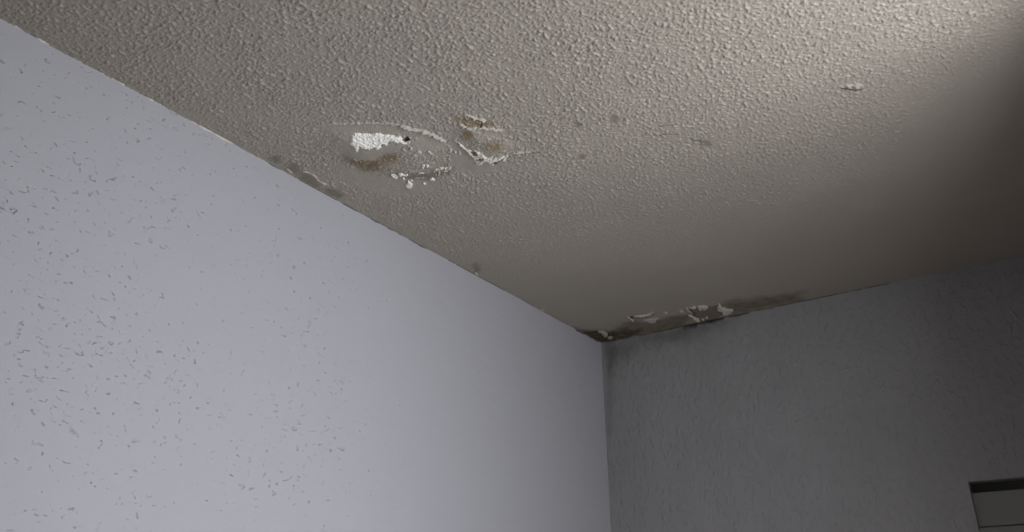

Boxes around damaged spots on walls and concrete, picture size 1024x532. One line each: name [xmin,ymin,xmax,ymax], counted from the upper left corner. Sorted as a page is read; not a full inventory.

peeling [321,121,508,189]
flaking render [627,303,733,324]